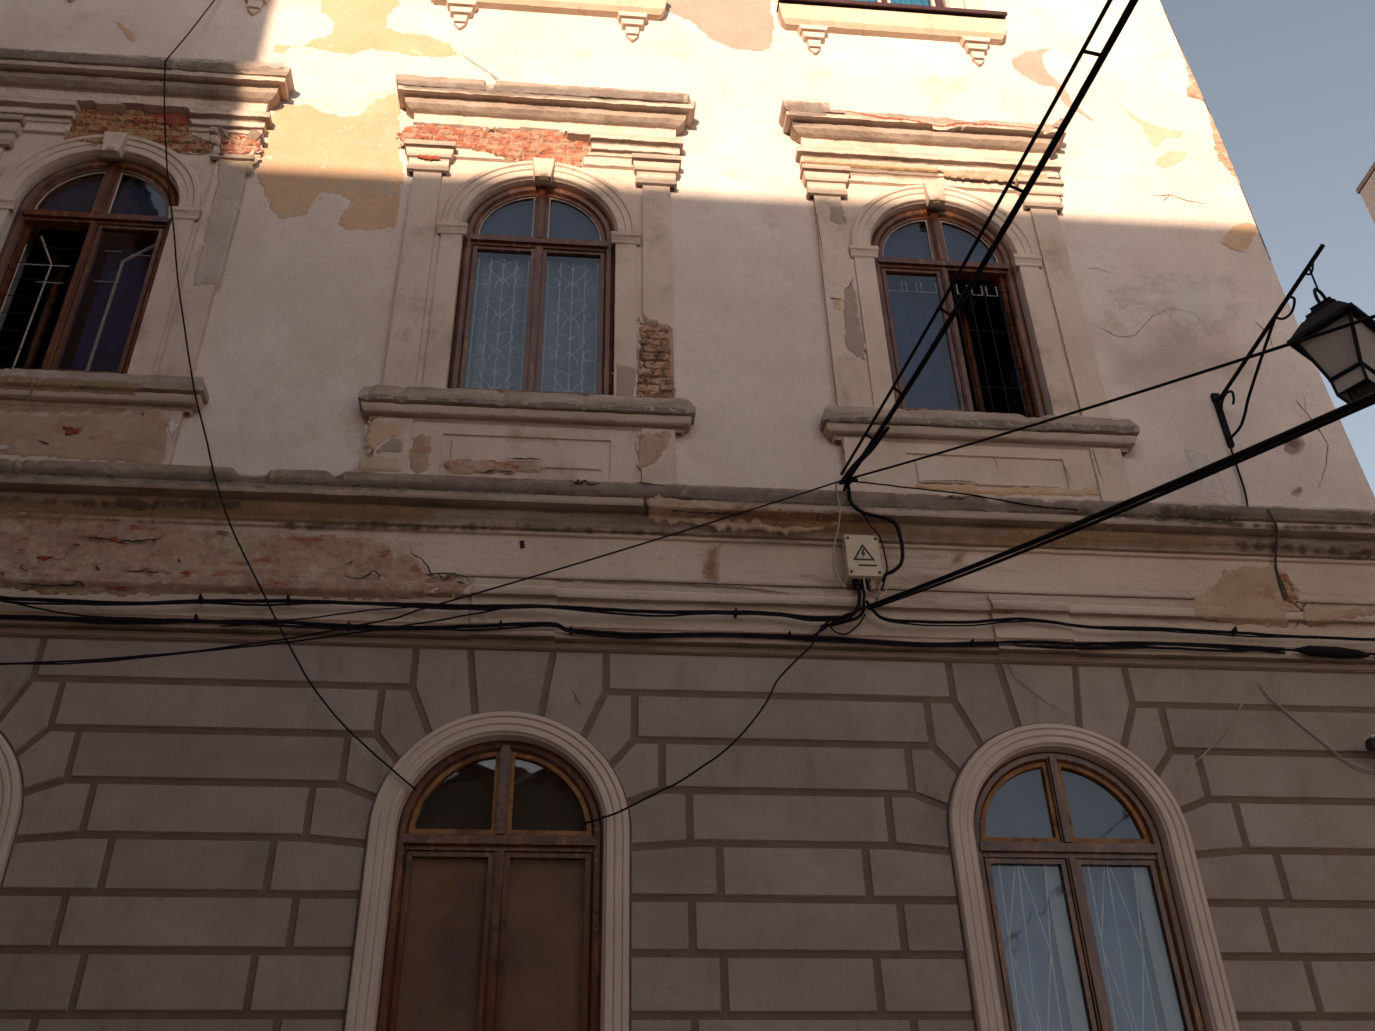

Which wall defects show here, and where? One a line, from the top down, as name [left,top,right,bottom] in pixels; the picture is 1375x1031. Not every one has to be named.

peeling [273,0,458,60]
flaking render [666,0,778,52]
flaking render [1010,45,1104,127]
spalling [1163,9,1271,261]
peeling [64,94,590,286]
flaking render [612,317,677,398]
flaking render [0,409,171,464]
spalling [364,418,545,477]
damp [0,445,1375,559]
crack [16,534,192,595]
flaking render [0,507,468,602]
flaking render [1193,566,1302,628]